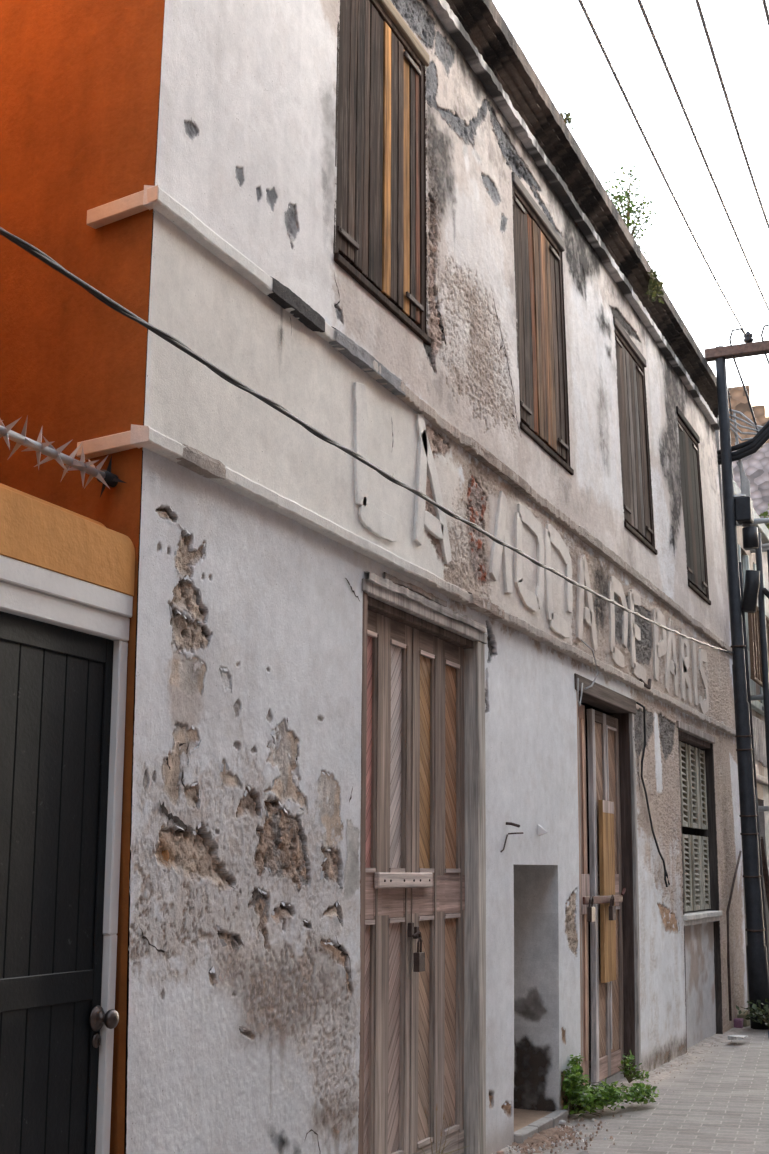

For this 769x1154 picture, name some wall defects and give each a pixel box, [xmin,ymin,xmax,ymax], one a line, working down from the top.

flaking render [184,118,200,138]
flaking render [390,0,563,239]
flaking render [256,188,298,247]
flaking render [423,194,444,370]
spalling [426,425,532,496]
flaking render [427,533,445,562]
flaking render [155,506,240,697]
flaking render [579,526,682,665]
peeling [144,724,201,808]
flaking render [154,822,235,890]
flaking render [220,711,344,946]
flaking render [565,890,578,956]